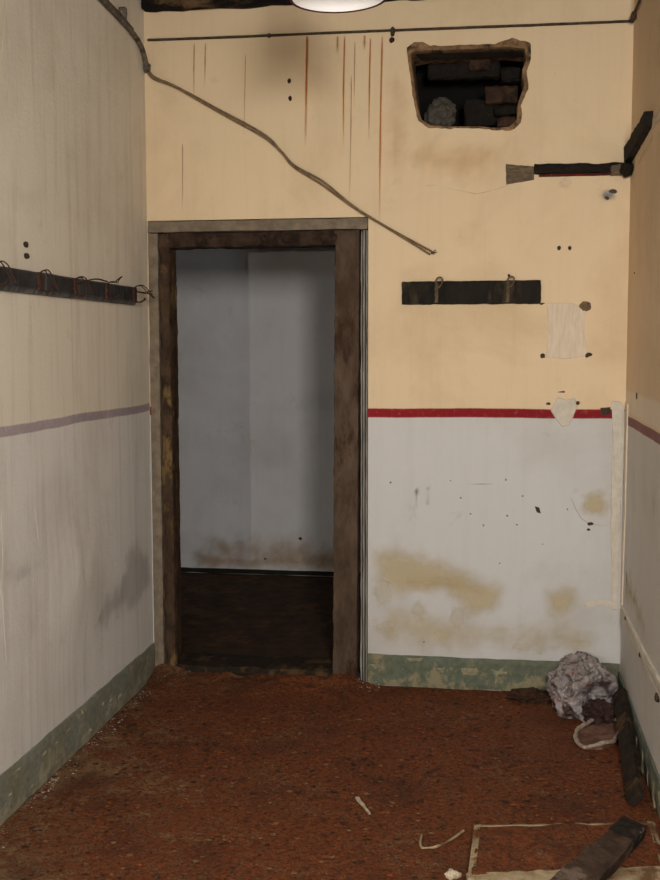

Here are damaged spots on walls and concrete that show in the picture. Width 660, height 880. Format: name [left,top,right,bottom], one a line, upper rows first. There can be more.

rust [337,37,355,118]
rust [364,36,383,158]
spalling [407,38,531,131]